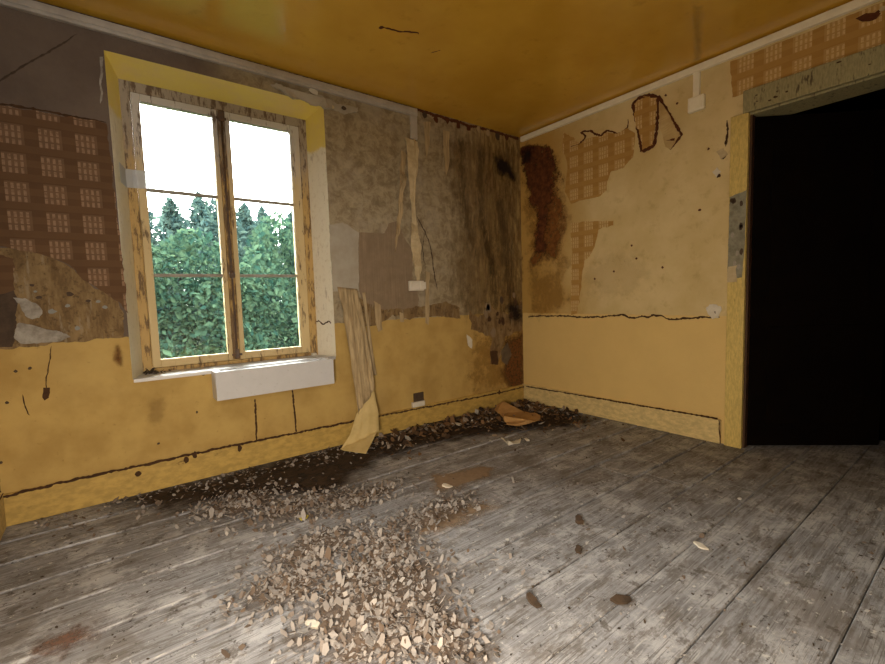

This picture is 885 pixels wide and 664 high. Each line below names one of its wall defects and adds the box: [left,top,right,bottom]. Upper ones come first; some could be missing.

crack [0,34,76,82]
crack [0,103,106,123]
crack [34,0,518,141]
damp [495,145,567,267]
peeling [727,190,747,282]
flaking render [0,248,124,350]
flaking render [358,221,523,365]
damp [508,303,522,322]
crack [528,313,720,321]
crack [22,348,51,415]
crack [0,390,354,500]
crack [379,386,721,444]